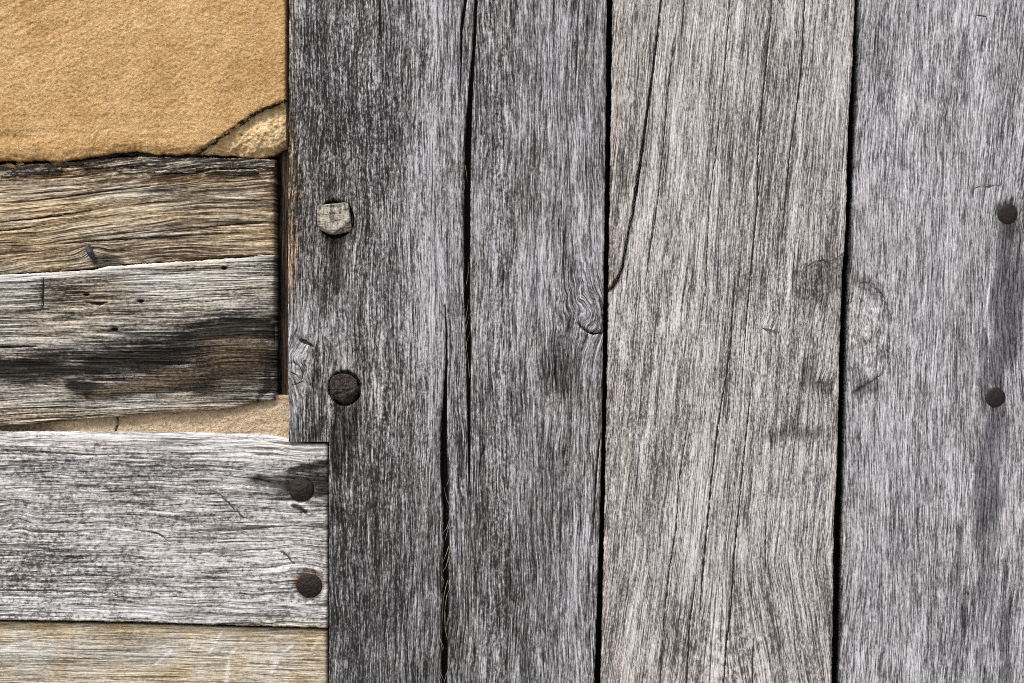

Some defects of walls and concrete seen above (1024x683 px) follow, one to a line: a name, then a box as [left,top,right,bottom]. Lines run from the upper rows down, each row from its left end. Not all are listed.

crack [607,0,684,292]